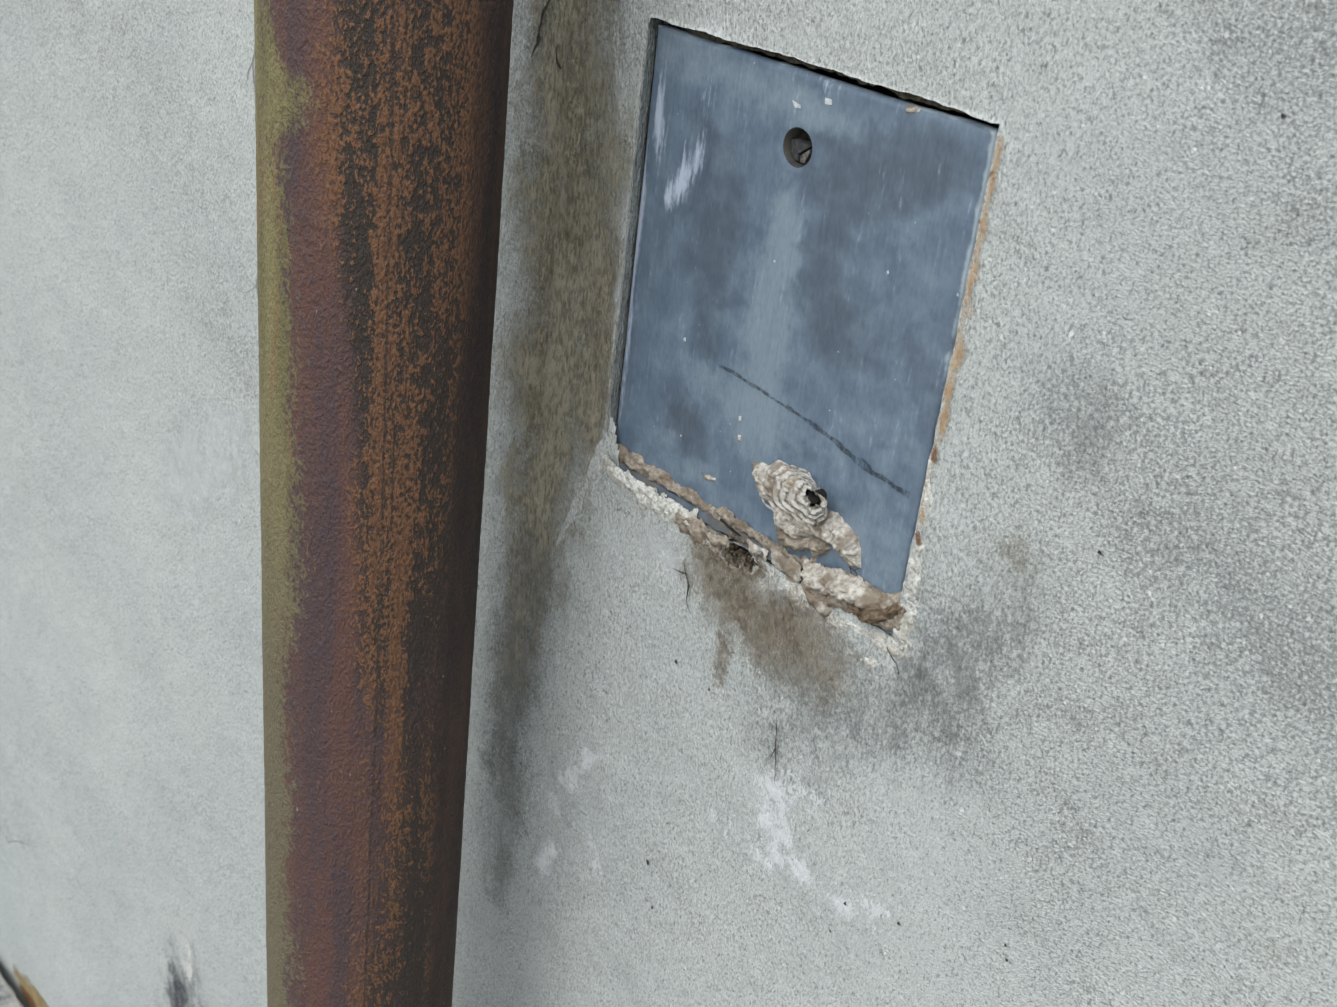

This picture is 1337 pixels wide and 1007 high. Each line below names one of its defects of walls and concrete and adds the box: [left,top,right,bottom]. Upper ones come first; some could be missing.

crack [246,47,256,133]
flaking render [696,454,932,669]
leakage [708,751,893,933]
leakage [167,938,195,1007]